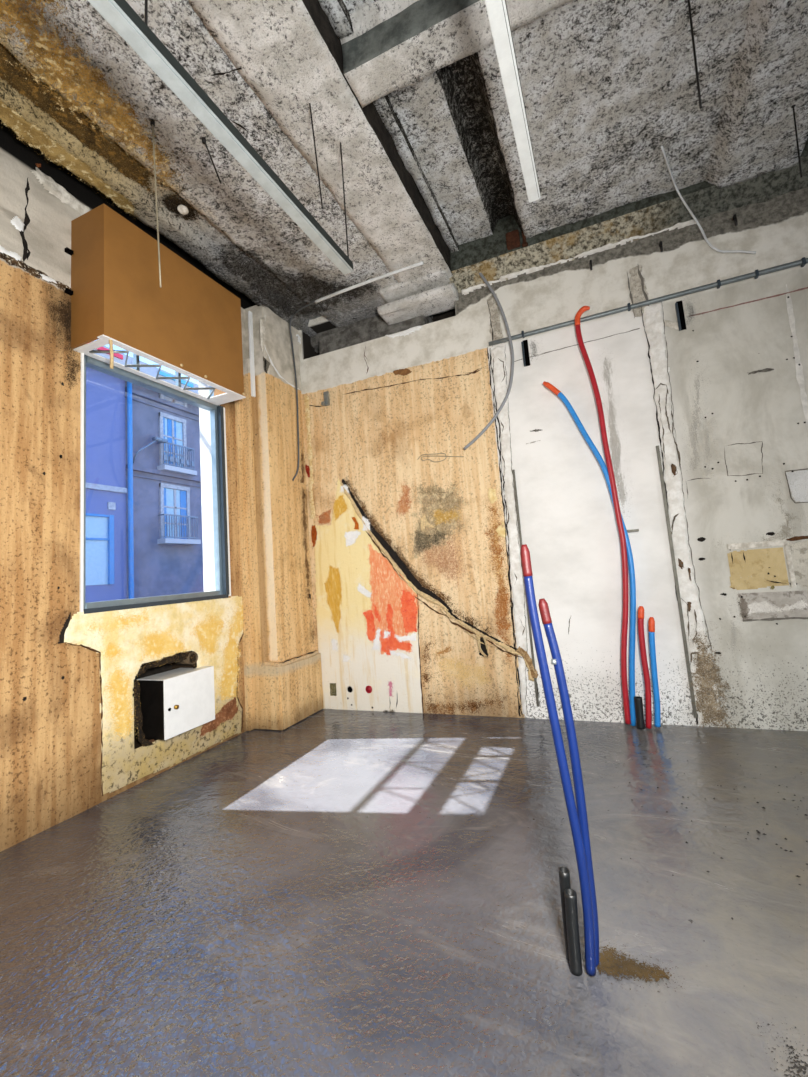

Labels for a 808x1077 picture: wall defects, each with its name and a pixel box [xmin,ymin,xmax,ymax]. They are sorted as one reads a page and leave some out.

damp [0,0,200,217]
spalling [11,216,25,231]
peeling [0,245,72,291]
peeling [344,515,370,549]
spalling [58,612,91,648]
peeling [373,627,417,661]
spalling [133,650,197,747]